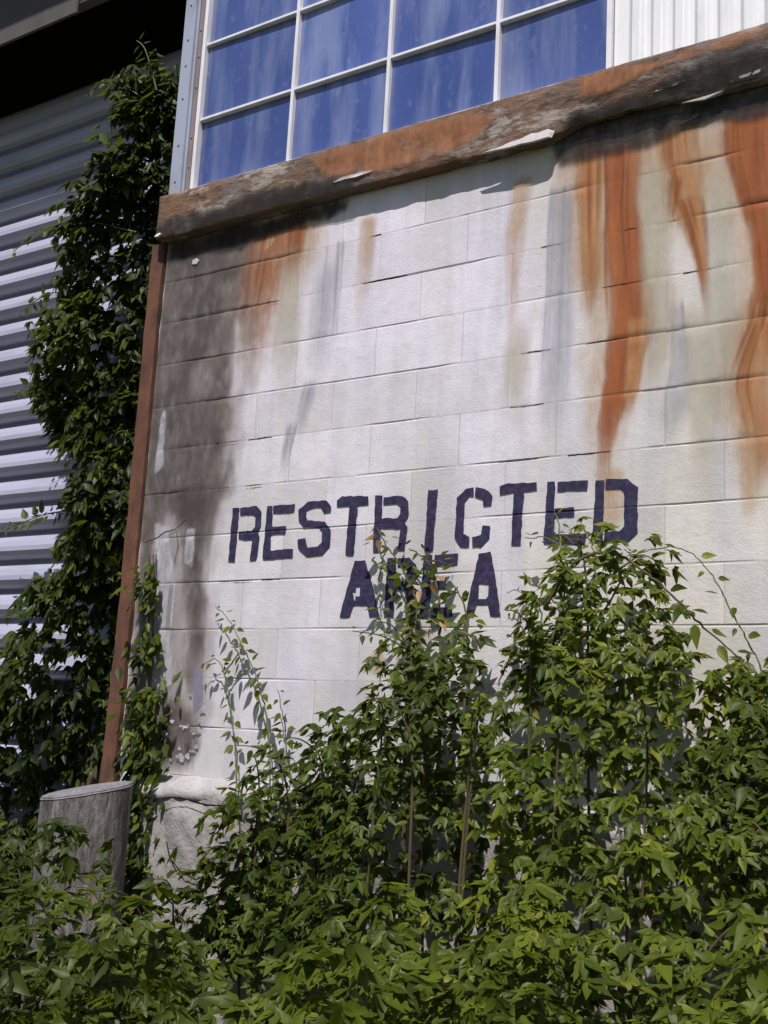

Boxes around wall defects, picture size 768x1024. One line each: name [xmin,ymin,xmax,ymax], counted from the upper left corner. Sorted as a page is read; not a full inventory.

rust [581,63,656,95]
rust [316,115,492,175]
leakage [156,178,352,259]
rust [241,209,305,314]
rust [572,112,768,495]
peeling [152,694,205,769]